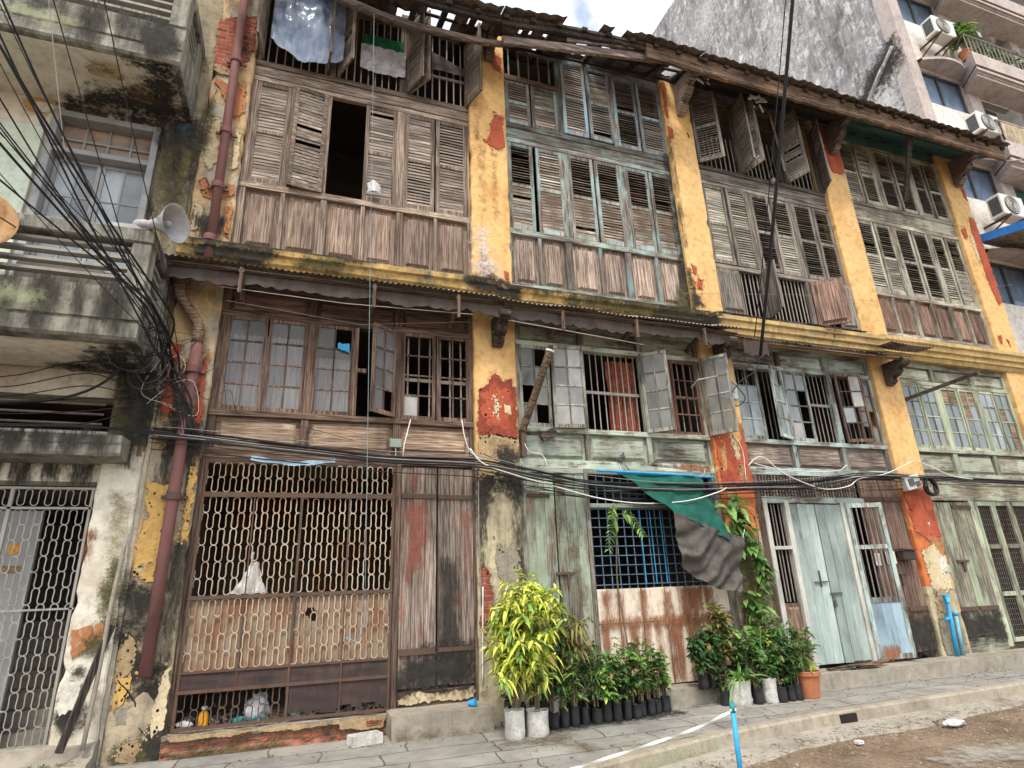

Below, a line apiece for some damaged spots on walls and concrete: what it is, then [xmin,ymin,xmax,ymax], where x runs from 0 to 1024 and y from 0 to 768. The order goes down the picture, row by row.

water stain [27,0,204,231]
spalling [190,14,258,238]
water stain [294,256,345,272]
water stain [473,279,521,300]
peeling [476,373,522,482]
peeling [714,417,753,487]
peeling [53,622,104,736]
peeling [132,482,169,587]
spalling [111,634,386,764]
water stain [396,469,526,699]
rust [602,586,733,682]
peeling [902,489,970,656]